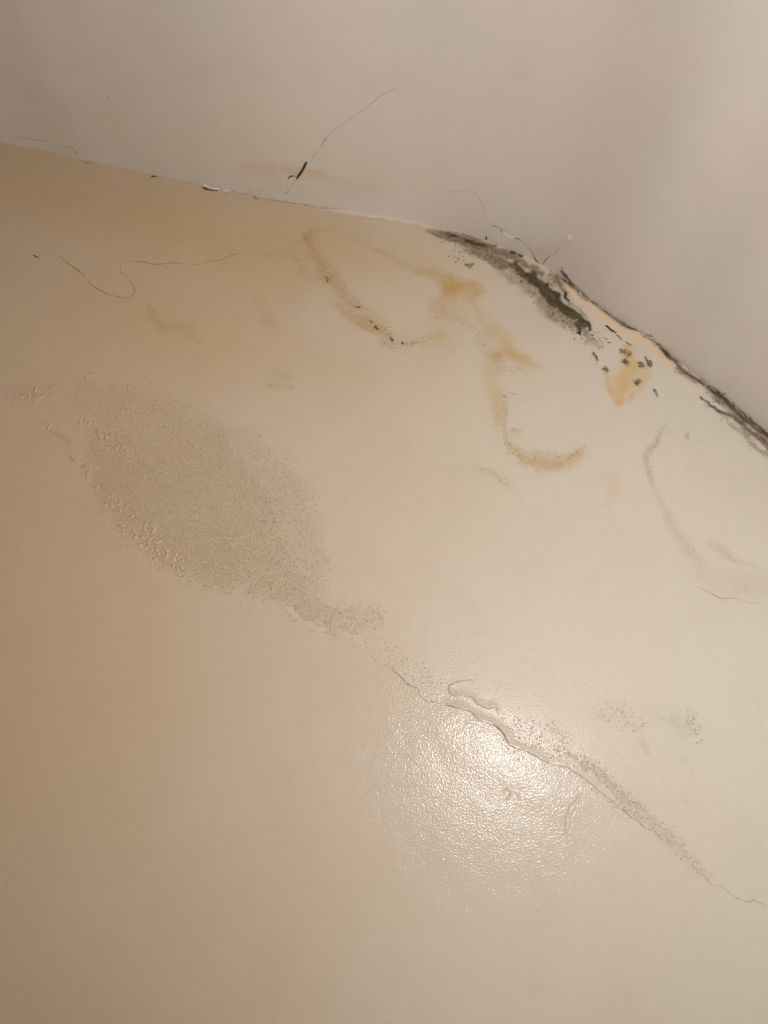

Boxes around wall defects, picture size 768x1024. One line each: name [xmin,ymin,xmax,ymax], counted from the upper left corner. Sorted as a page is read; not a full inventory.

crack [202,162,307,202]
water stain [432,231,768,452]
crack [441,680,632,818]